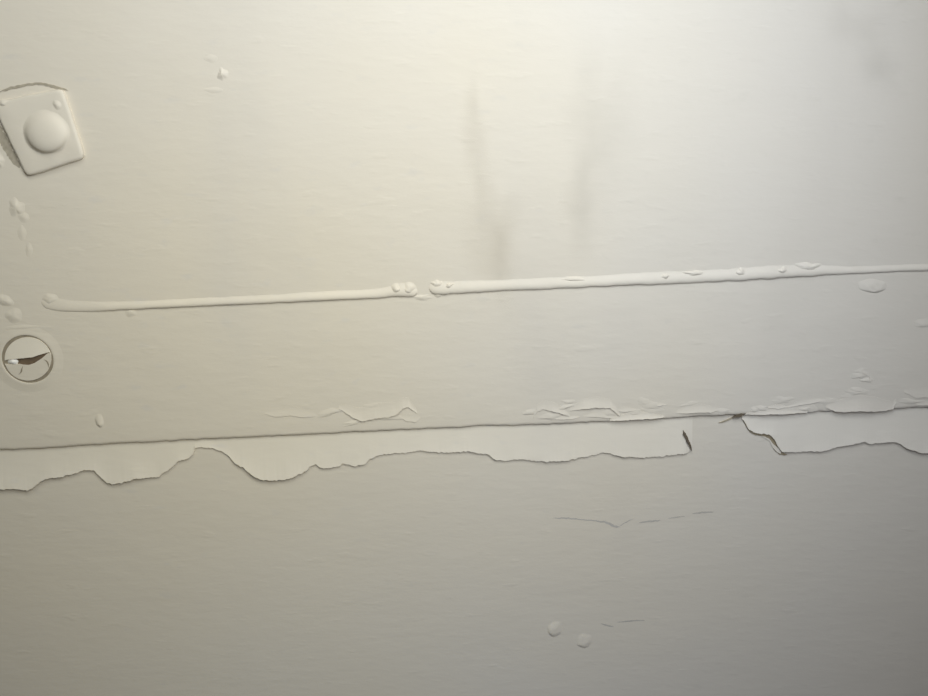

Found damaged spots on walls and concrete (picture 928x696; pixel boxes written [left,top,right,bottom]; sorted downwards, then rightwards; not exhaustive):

peeling [0,396,730,491]
peeling [742,367,928,455]